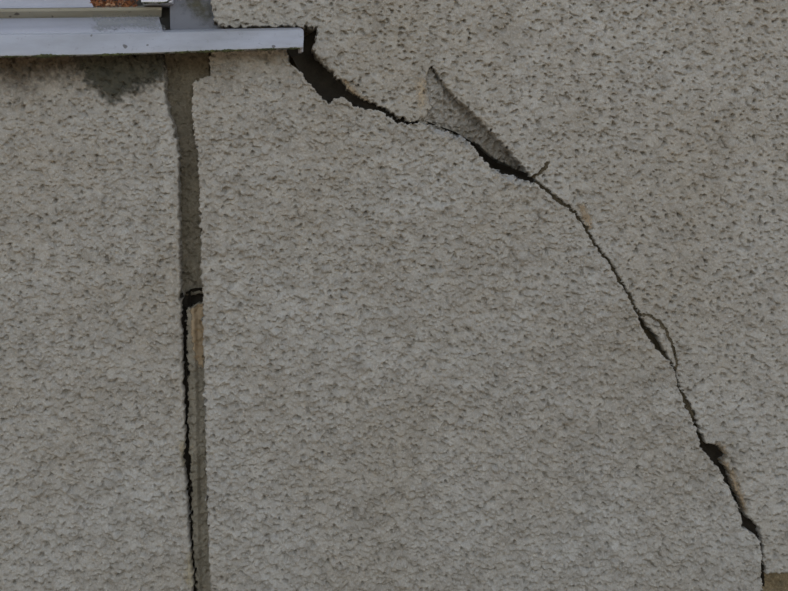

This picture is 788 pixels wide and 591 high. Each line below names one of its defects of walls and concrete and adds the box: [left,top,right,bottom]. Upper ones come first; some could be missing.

crack [180,288,204,591]
crack [285,30,765,587]